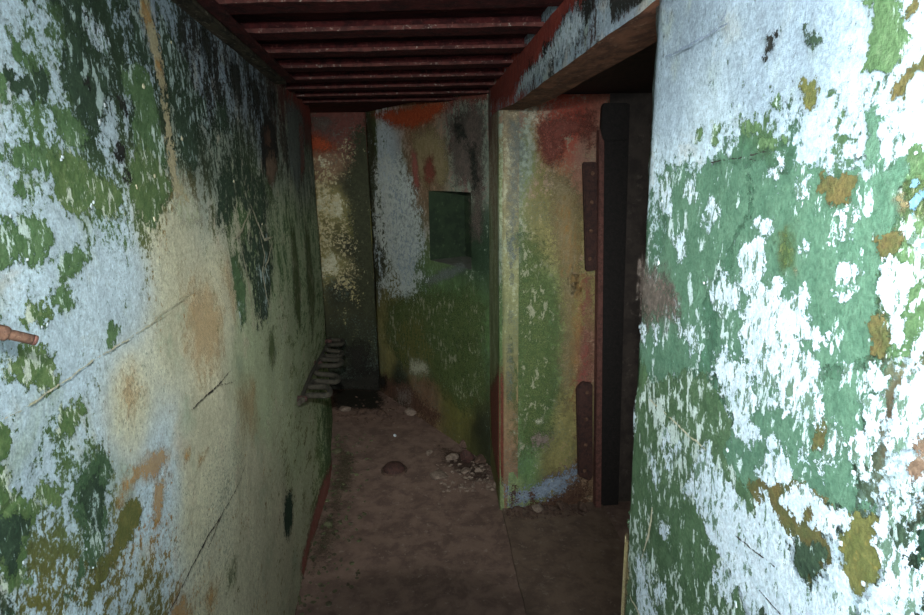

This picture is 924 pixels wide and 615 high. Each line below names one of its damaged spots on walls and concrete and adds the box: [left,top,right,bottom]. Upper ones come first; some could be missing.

damp [137,0,305,230]
peeling [490,0,585,104]
peeling [0,0,201,447]
crack [1,291,200,420]
damp [229,230,275,369]
damp [290,221,316,336]
peeling [621,0,924,615]
peeling [0,414,147,615]
spalling [502,456,592,508]